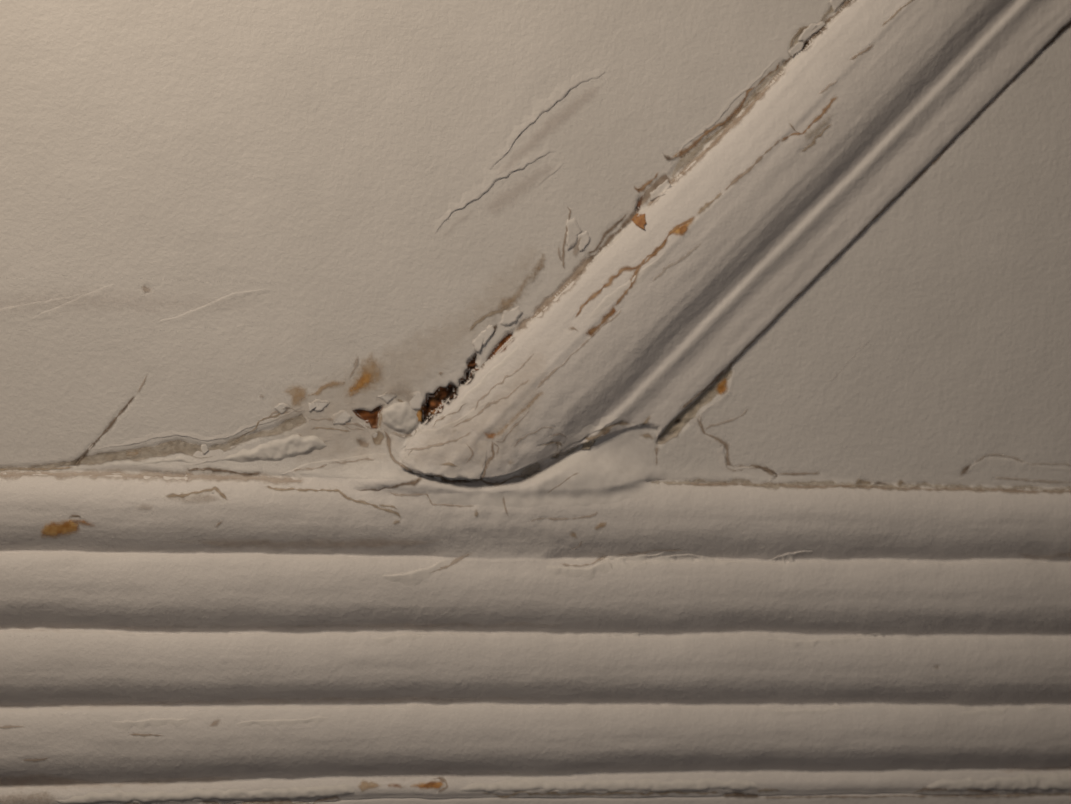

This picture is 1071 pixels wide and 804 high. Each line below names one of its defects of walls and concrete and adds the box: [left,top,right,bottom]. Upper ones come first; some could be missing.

crack [852,0,912,59]
peeling [558,208,590,267]
peeling [571,217,694,335]
crack [517,0,852,330]
flaking render [631,0,845,230]
crack [735,22,1071,361]
flaking render [1,306,522,479]
crack [0,312,620,524]
flaking render [521,416,628,476]
flaking render [643,364,735,464]
crack [651,411,1071,493]
corrosion [42,515,88,536]